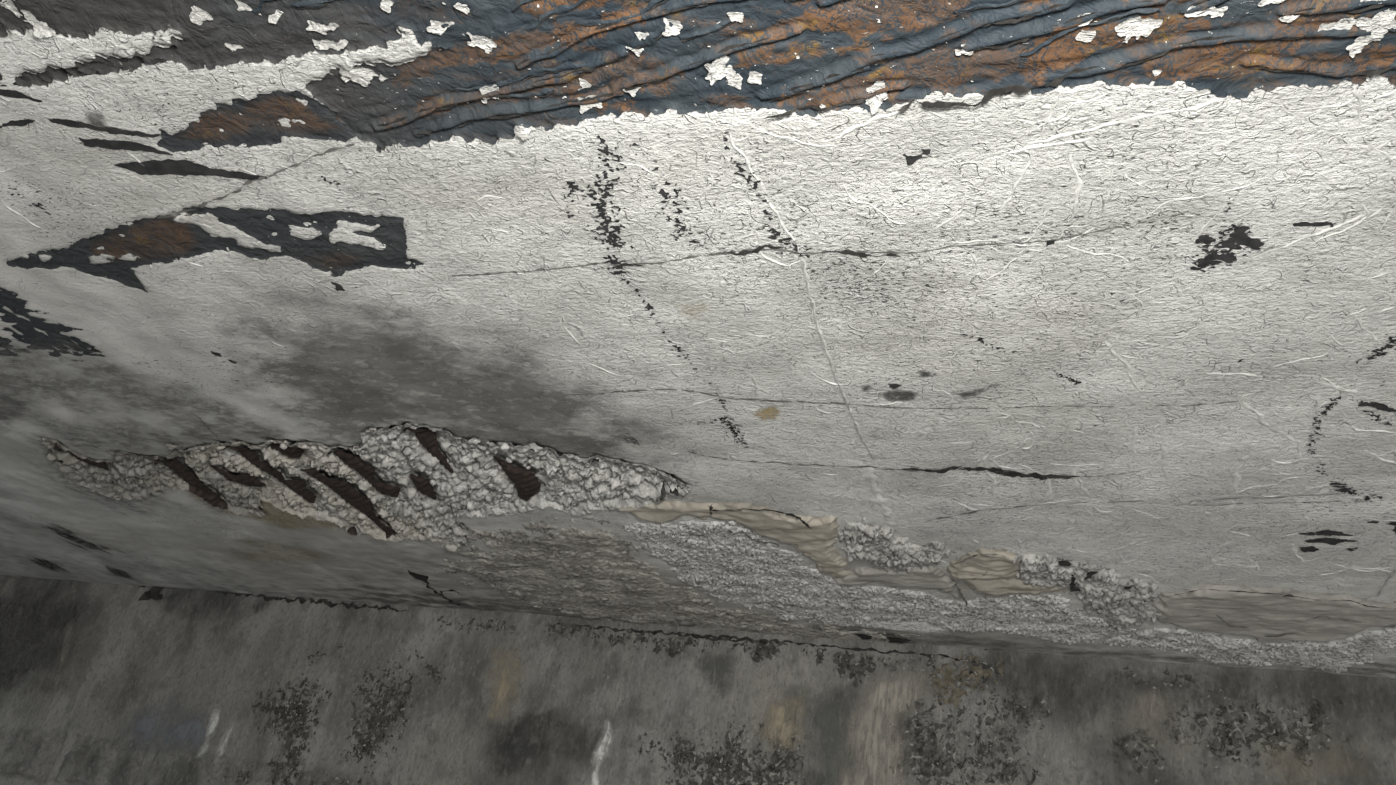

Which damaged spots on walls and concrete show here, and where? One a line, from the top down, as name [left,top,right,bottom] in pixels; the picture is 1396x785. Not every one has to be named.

peeling [0,0,1396,180]
peeling [6,206,424,293]
crack [452,210,1204,276]
peeling [1195,227,1264,267]
peeling [0,287,106,362]
crack [572,389,1238,409]
crack [1190,494,1372,505]
spalling [38,422,1396,673]